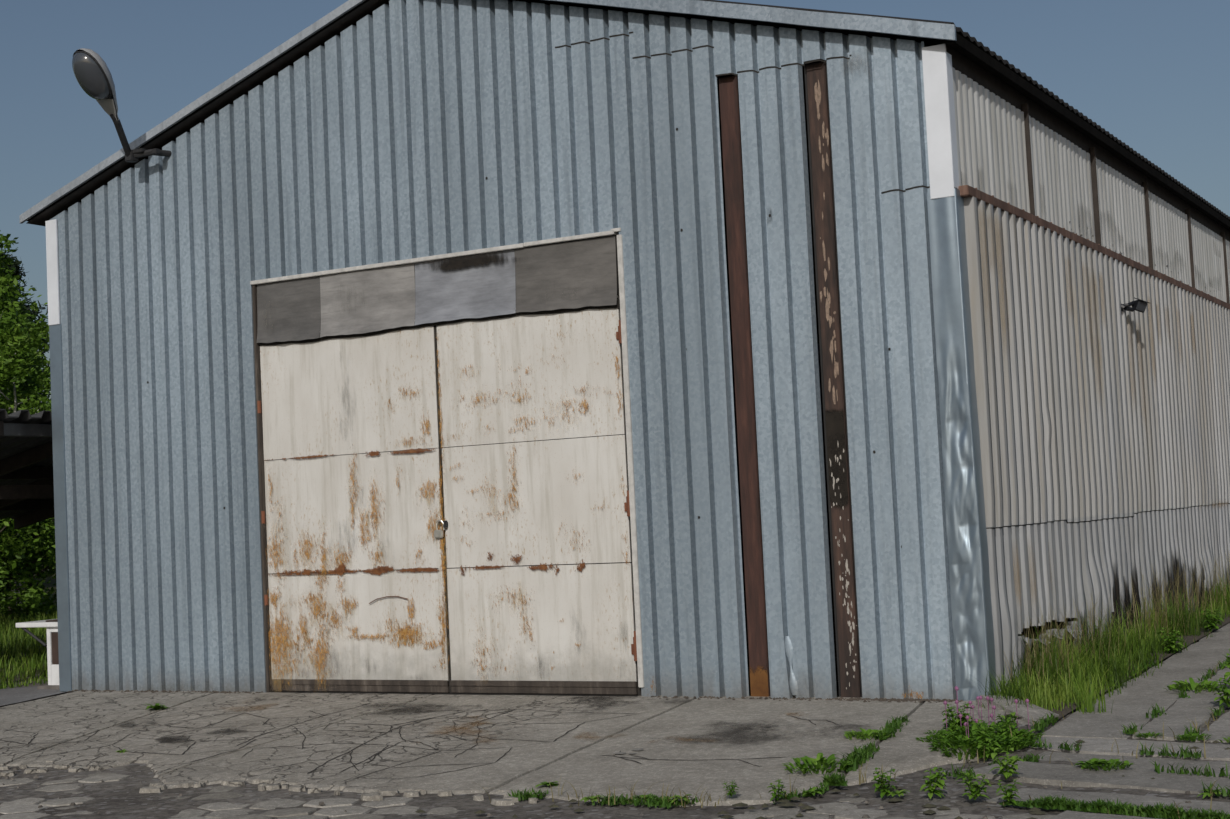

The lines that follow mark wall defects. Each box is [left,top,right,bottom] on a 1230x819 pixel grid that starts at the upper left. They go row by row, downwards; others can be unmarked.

rust [266,339,559,689]
rust [457,356,623,523]
peeling [829,443,860,689]
crack [2,703,635,782]
crack [602,751,668,764]
rust [750,667,769,697]